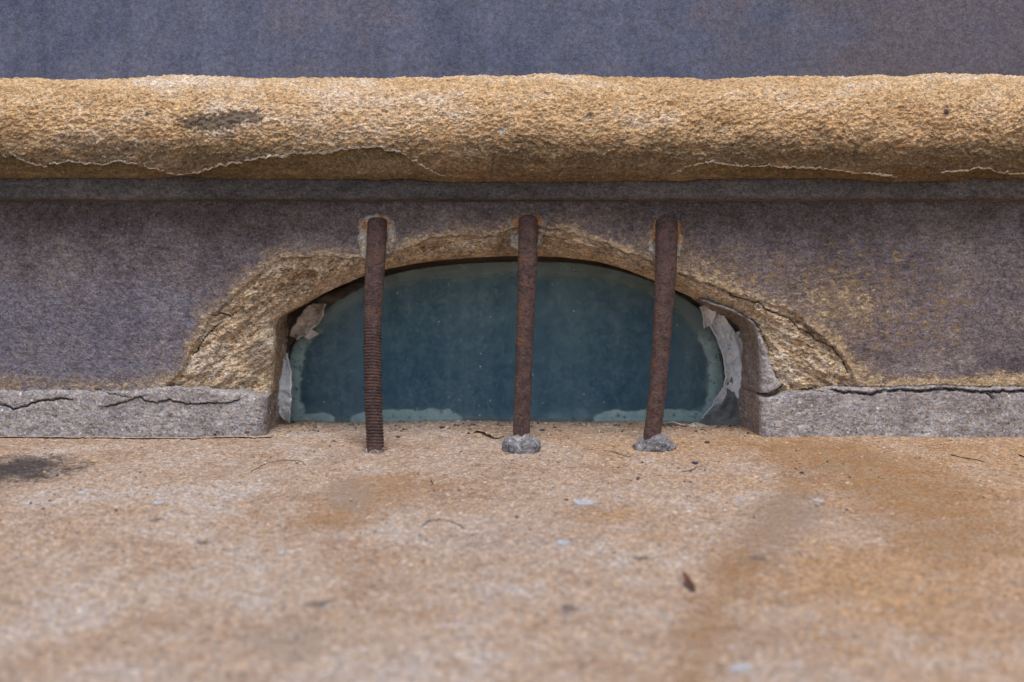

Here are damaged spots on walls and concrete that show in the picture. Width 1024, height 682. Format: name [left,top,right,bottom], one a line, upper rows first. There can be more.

damp [177,108,263,133]
spalling [385,229,518,270]
spalling [537,228,655,281]
spalling [166,254,366,423]
spalling [675,272,858,419]
crack [729,293,1024,398]
crack [0,397,73,410]
crack [96,389,241,407]
damp [0,456,91,482]